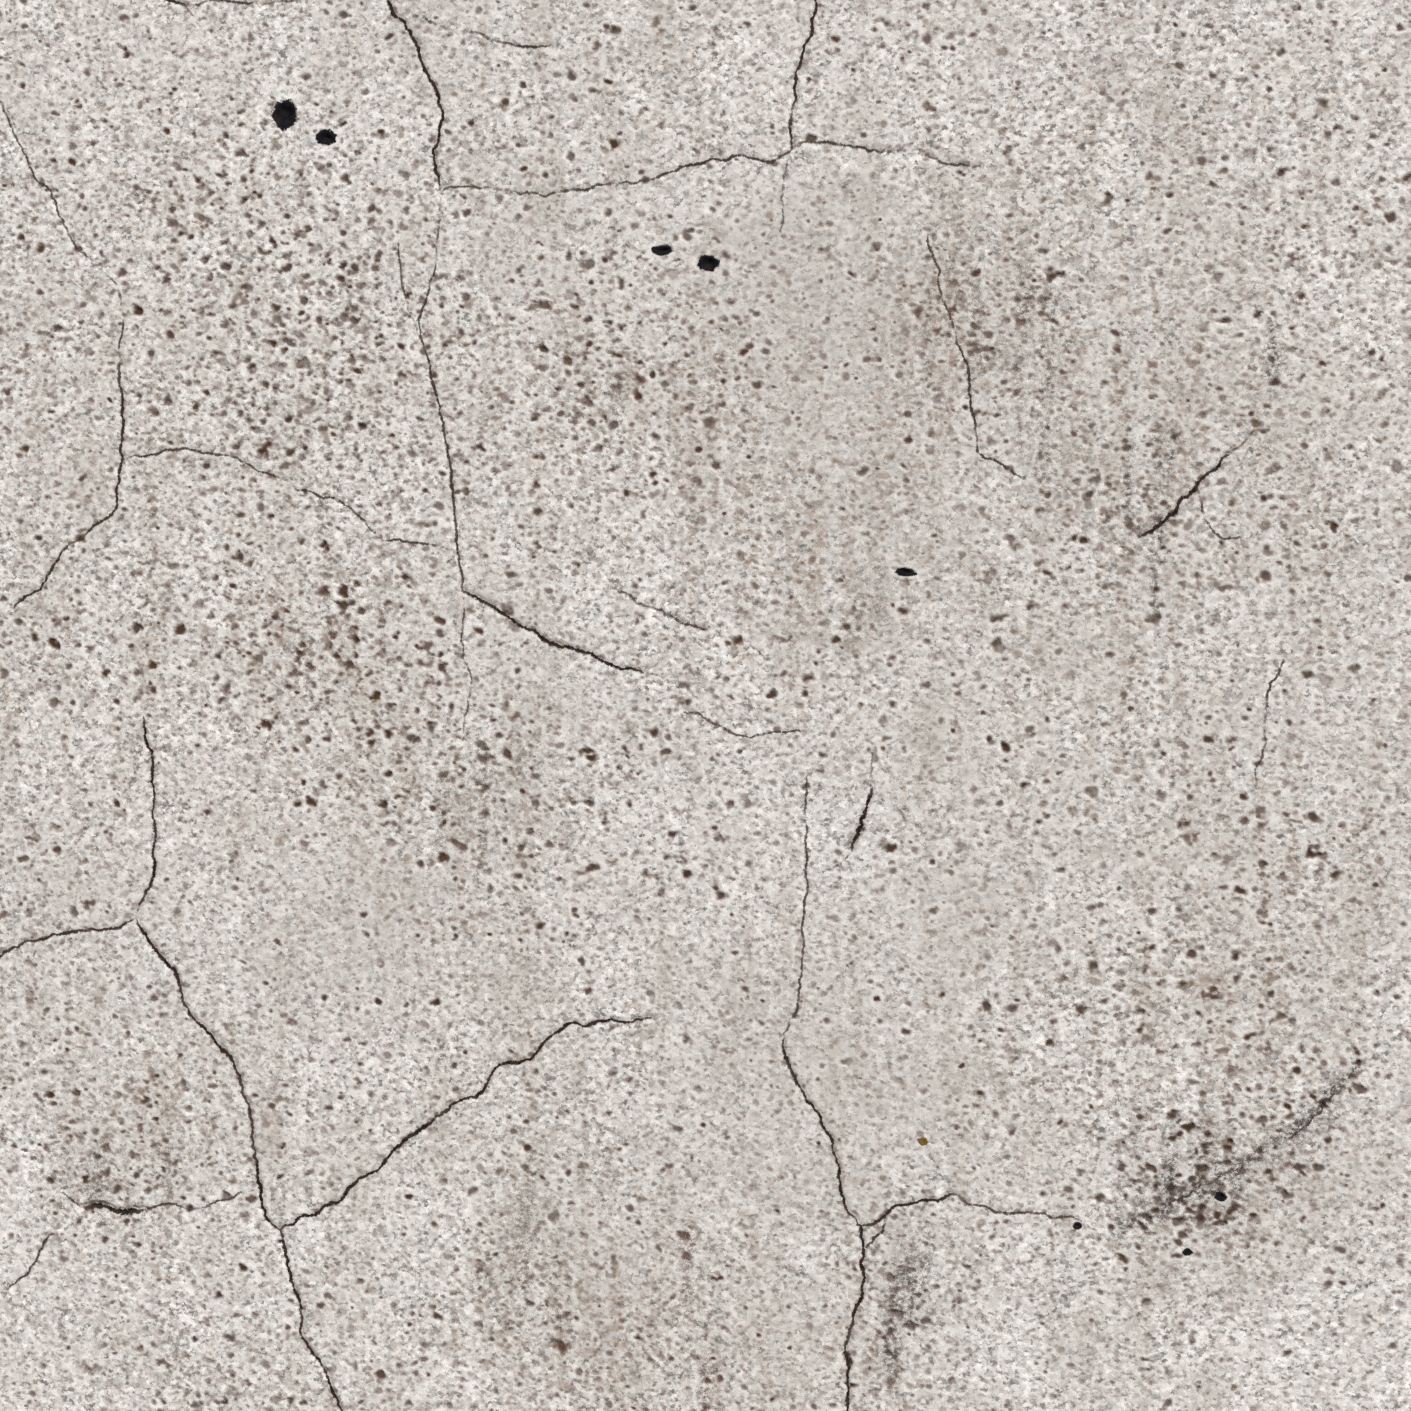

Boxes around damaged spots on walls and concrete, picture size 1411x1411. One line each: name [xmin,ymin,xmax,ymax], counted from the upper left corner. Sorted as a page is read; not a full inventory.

crack [168,0,294,8]
crack [387,0,981,231]
crack [0,101,657,731]
crack [926,236,1026,479]
crack [1138,431,1254,540]
crack [618,590,707,630]
crack [684,711,801,738]
crack [1254,661,1284,779]
crack [0,716,652,1411]
crack [782,753,1082,1411]
crack [1289,1077,1350,1140]
crack [1164,1164,1245,1209]